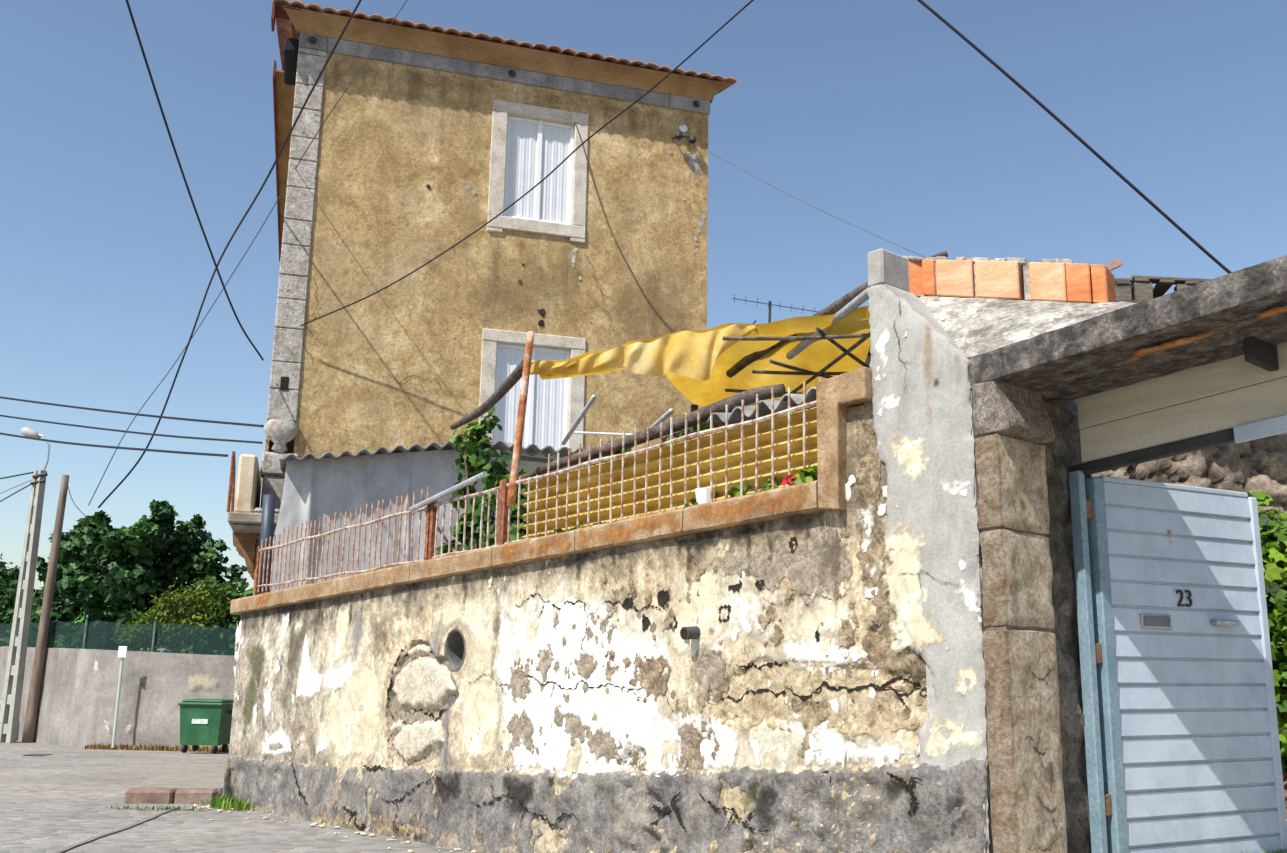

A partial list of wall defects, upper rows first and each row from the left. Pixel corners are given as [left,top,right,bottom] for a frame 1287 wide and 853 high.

peeling [874,328,907,380]
peeling [234,394,983,853]
crack [763,593,832,605]
crack [342,583,674,832]
crack [706,661,927,709]
water stain [435,682,461,803]
water stain [503,777,532,812]
water stain [746,782,777,821]